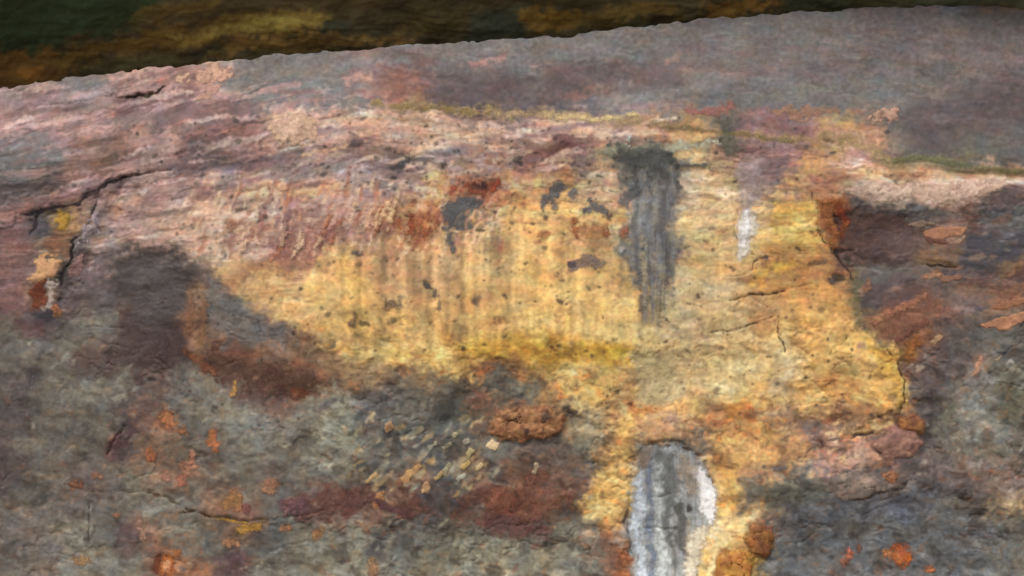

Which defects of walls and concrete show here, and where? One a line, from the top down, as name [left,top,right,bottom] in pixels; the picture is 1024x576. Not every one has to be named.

crack [14,176,132,286]
corrosion [449,178,501,197]
damp [370,99,1024,324]
corrosion [819,198,850,245]
damp [100,240,197,375]
corrosion [183,286,317,399]
corrosion [220,489,262,548]
corrosion [261,478,434,540]
damp [627,440,716,576]